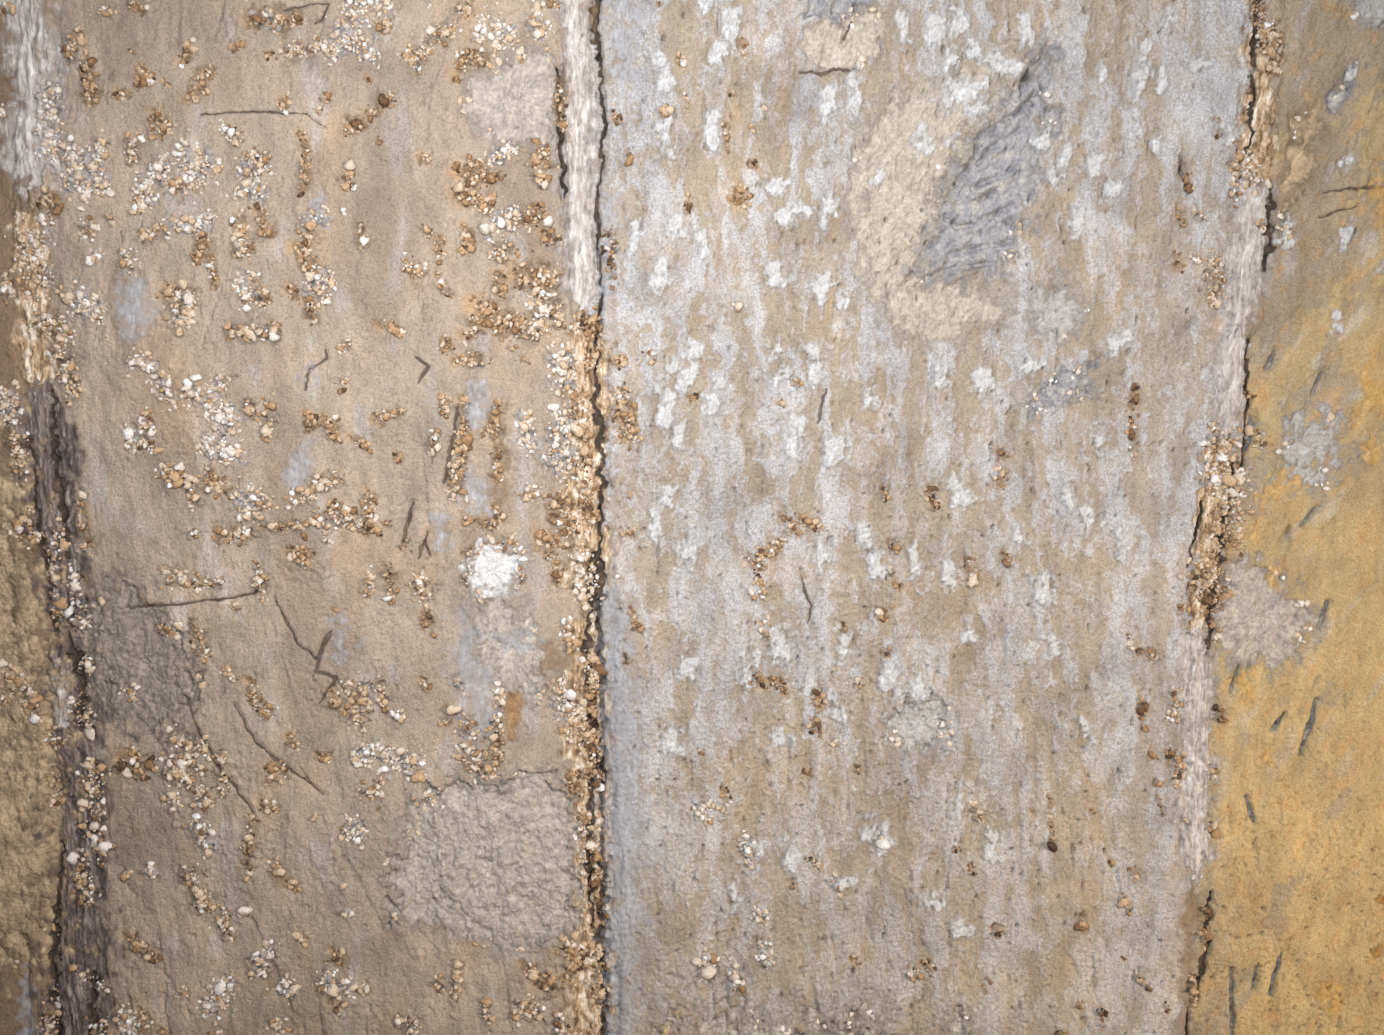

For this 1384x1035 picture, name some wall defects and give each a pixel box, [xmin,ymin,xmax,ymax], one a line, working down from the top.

crack [415,356,430,384]
crack [0,0,345,1035]
crack [526,0,656,1035]
crack [1163,0,1384,1035]
leakage [690,797,733,826]
leakage [737,830,758,870]
leakage [874,829,891,849]
leakage [692,905,776,994]